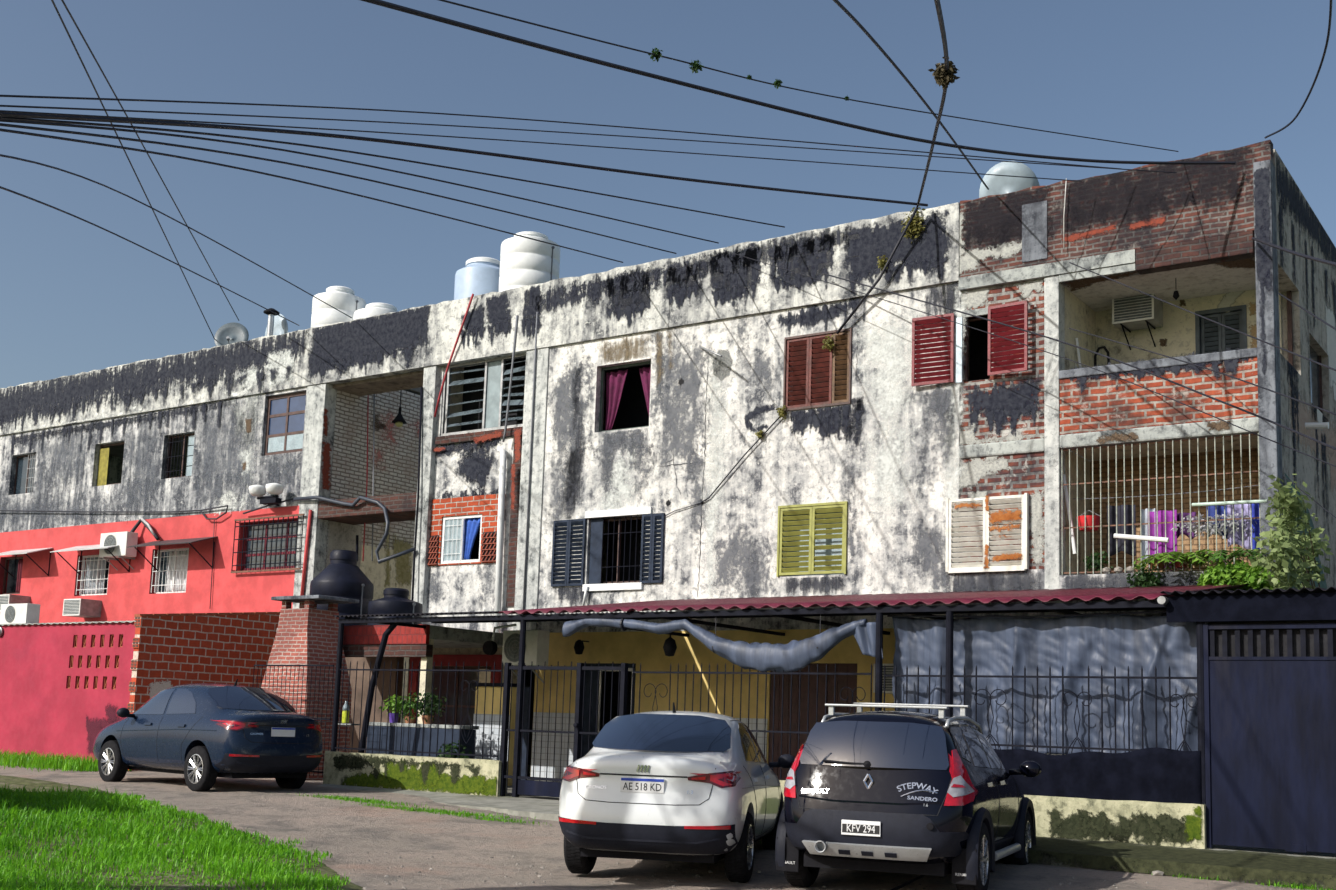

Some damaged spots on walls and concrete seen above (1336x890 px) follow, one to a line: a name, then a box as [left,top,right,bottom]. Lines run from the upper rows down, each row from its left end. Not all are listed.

spalling [1061,216,1166,243]
spalling [1215,258,1255,269]
damp [460,147,1336,562]
spalling [943,209,1044,498]
damp [0,305,432,530]
spalling [1207,420,1231,431]
damp [435,438,501,499]
damp [713,524,843,598]
damp [913,521,1040,604]
damp [1066,570,1204,602]
damp [333,754,480,785]